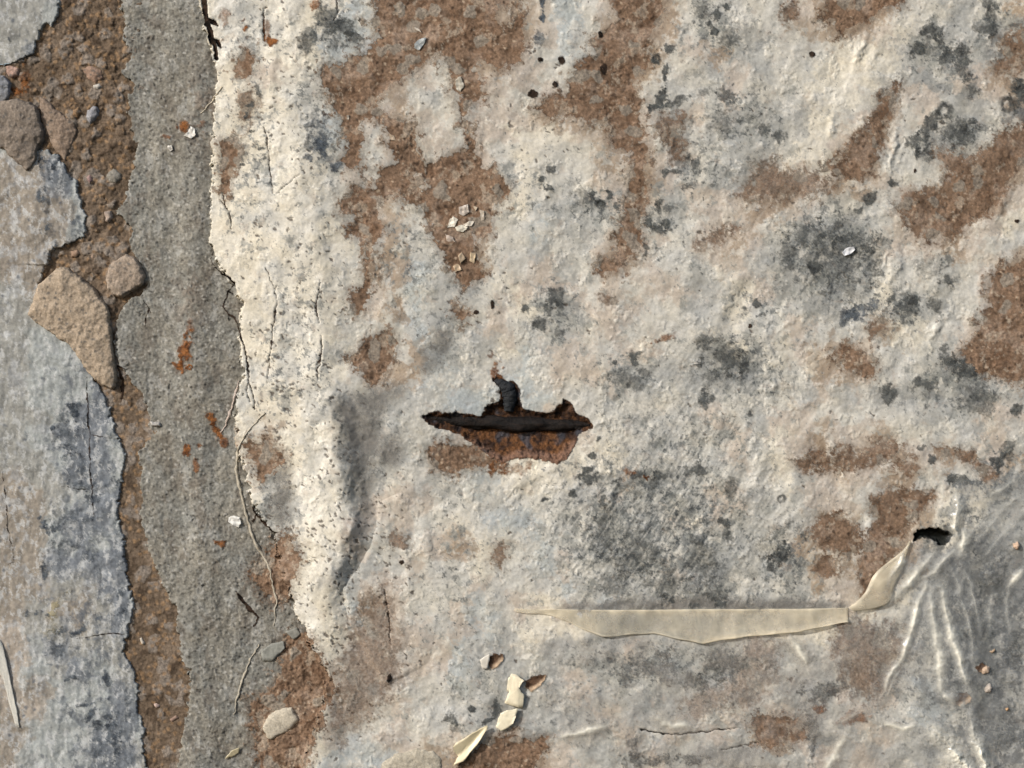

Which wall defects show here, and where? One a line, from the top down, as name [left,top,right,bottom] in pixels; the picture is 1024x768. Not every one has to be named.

crack [201,0,221,61]
flaking render [212,45,264,201]
corrosion [172,329,193,374]
corrosion [182,444,202,473]
corrosion [205,413,228,448]
flaking render [236,431,294,488]
spalling [420,376,593,482]
flaking render [247,530,308,614]
flaking render [788,436,938,696]
flaking render [240,600,394,768]
spalling [488,653,504,669]
flaking render [457,727,556,768]